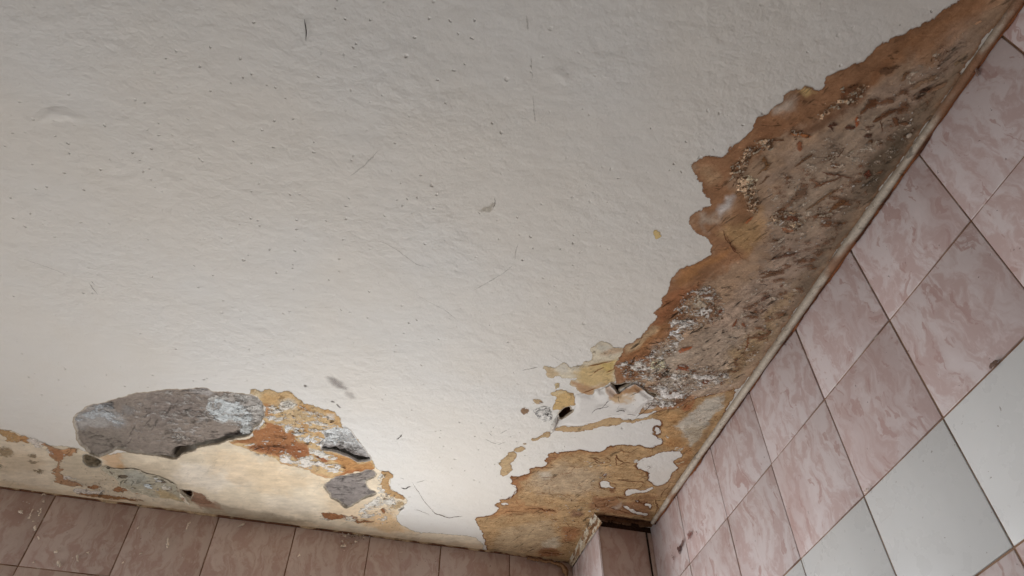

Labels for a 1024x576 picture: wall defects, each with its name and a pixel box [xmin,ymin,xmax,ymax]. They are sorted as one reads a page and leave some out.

spalling [68,387,266,505]
spalling [320,427,377,509]
peeling [533,381,657,434]
spalling [568,513,653,567]